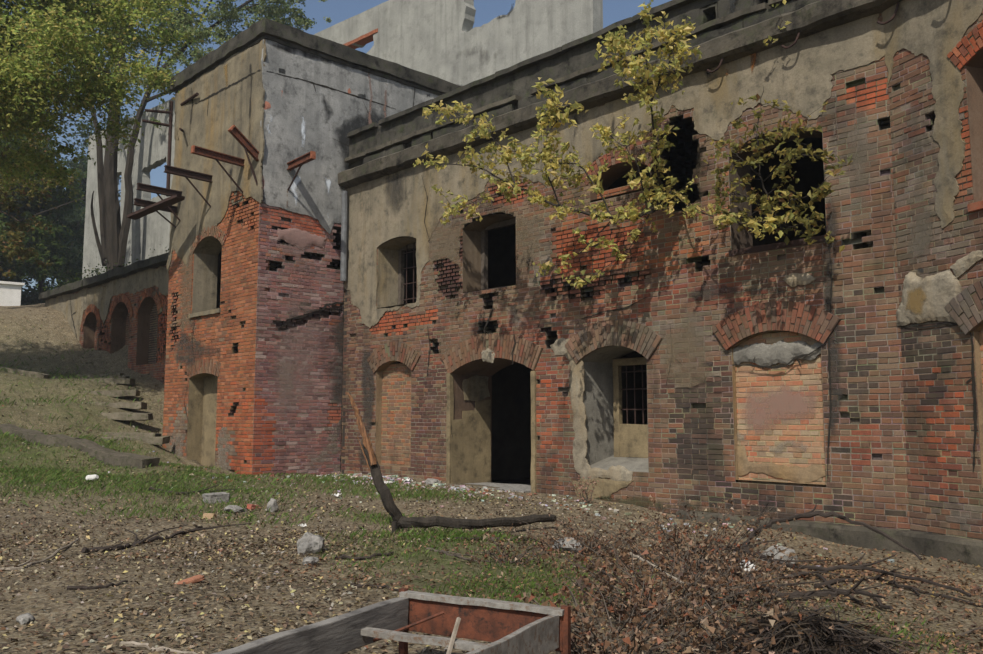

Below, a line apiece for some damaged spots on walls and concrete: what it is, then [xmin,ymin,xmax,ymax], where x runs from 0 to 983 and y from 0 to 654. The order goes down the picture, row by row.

crack [193,70,416,114]
water stain [336,113,383,170]
spalling [837,77,890,130]
spalling [925,112,936,132]
spalling [225,191,341,272]
spalling [433,236,463,300]
spalling [539,223,652,303]
spalling [686,255,711,272]
spalling [157,288,182,365]
spalling [273,303,343,332]
crack [277,302,344,329]
spalling [363,309,438,337]